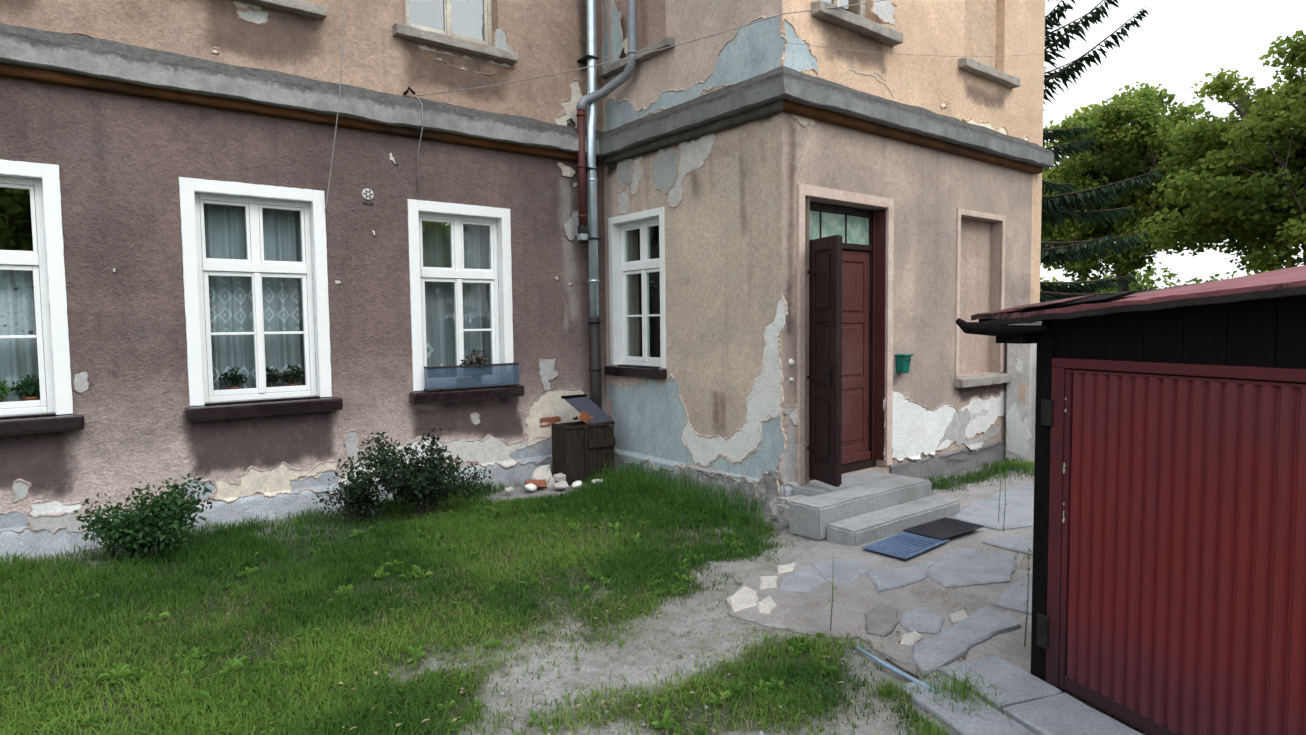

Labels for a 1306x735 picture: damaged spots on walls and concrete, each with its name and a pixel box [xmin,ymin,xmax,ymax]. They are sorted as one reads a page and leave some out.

peeling [871,0,897,25]
peeling [789,114,816,128]
peeling [616,133,716,215]
leakage [0,431,69,495]
leakage [188,411,332,473]
peeling [176,357,589,504]
peeling [614,291,800,516]
peeling [883,358,1032,466]
peeling [0,478,92,535]